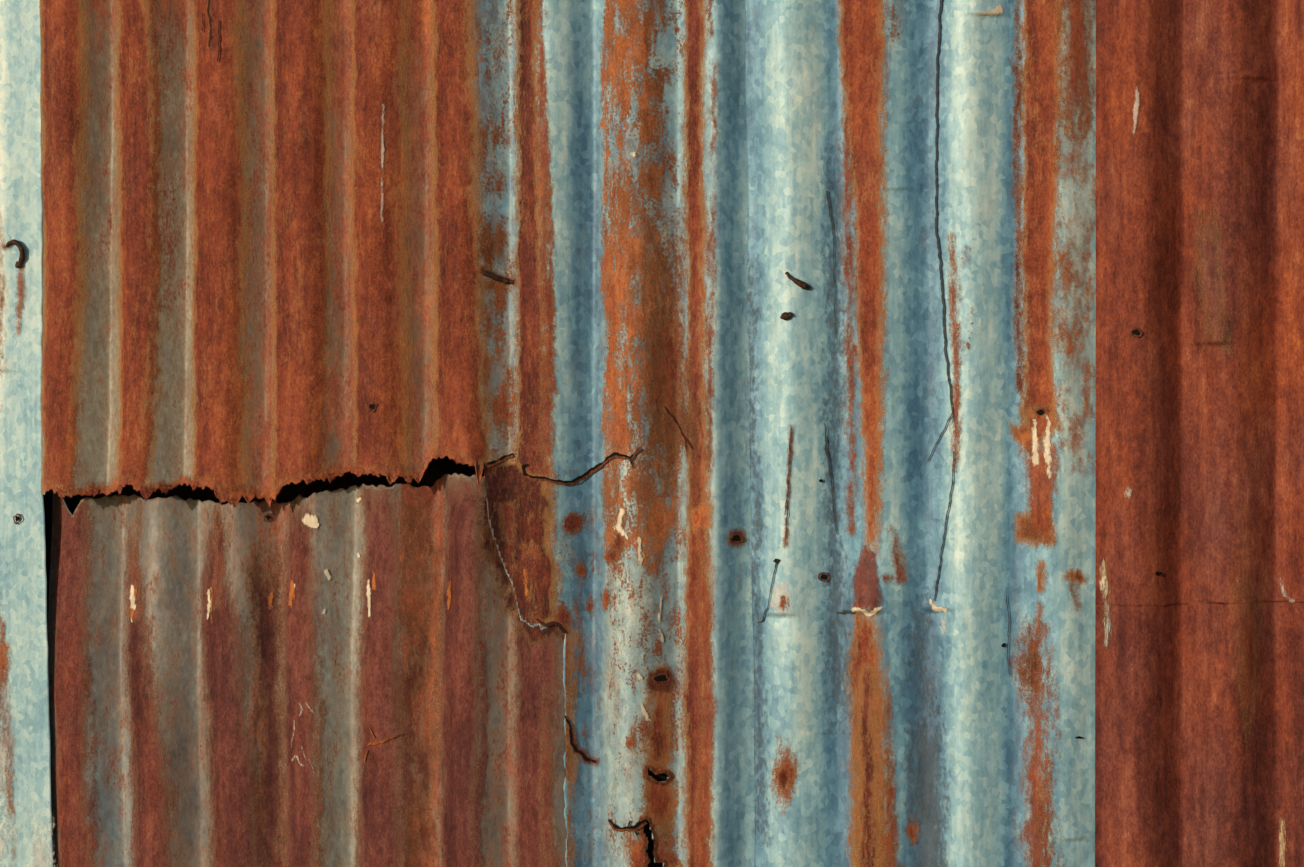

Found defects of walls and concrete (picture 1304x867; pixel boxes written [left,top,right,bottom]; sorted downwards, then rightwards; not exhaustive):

rust [39,0,99,867]
rust [116,0,178,867]
rust [191,0,252,493]
rust [198,500,326,867]
rust [269,0,334,493]
rust [349,0,719,867]
crack [534,617,569,635]
rust [770,744,798,809]
rust [837,0,919,867]
crack [928,0,954,601]
rust [948,234,976,472]
rust [1009,0,1096,867]